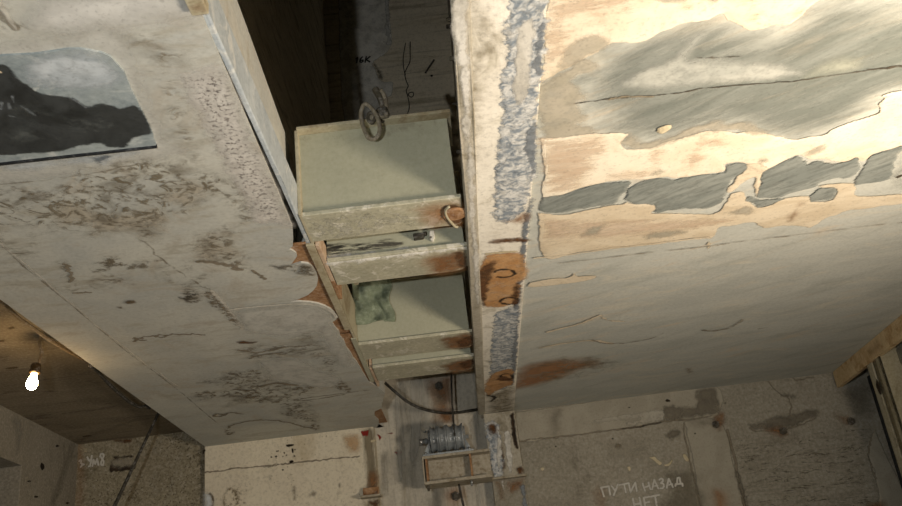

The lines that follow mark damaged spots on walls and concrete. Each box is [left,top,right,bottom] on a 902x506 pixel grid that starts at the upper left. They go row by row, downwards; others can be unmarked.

crack [575,65,902,104]
peeling [491,0,902,267]
leakage [0,164,228,236]
rust [434,252,467,271]
rust [480,238,529,307]
leakage [197,370,319,435]
rust [484,361,591,395]